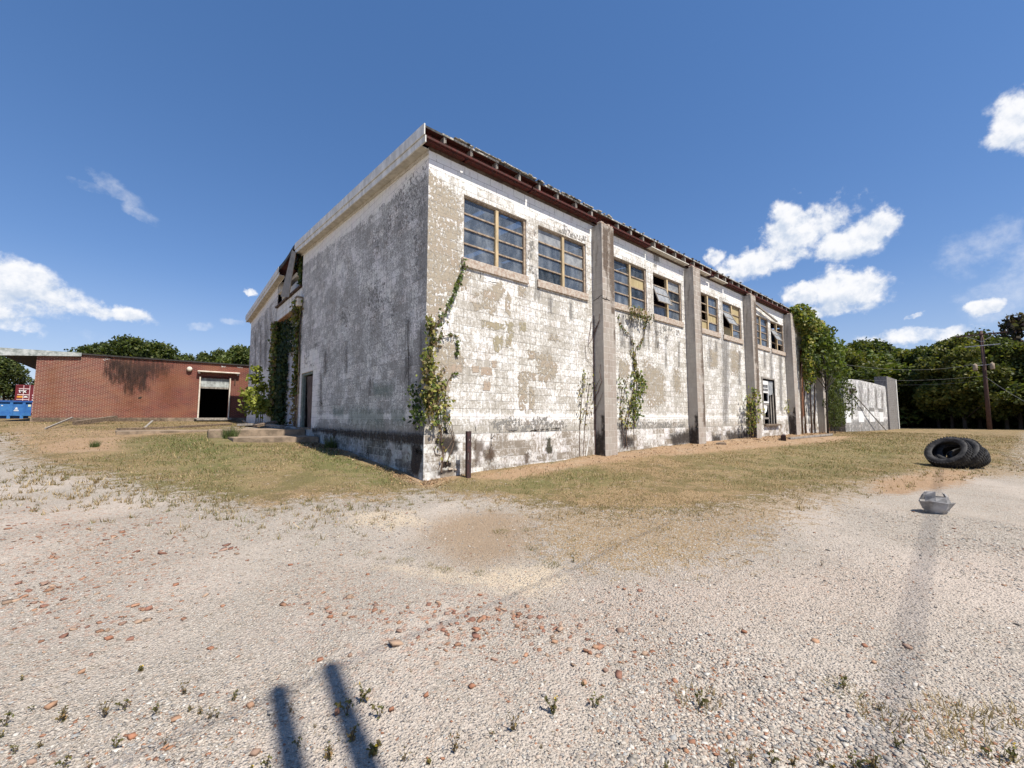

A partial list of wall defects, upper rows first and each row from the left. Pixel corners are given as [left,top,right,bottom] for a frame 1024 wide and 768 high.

peeling [372,166,526,391]
peeling [491,333,567,433]